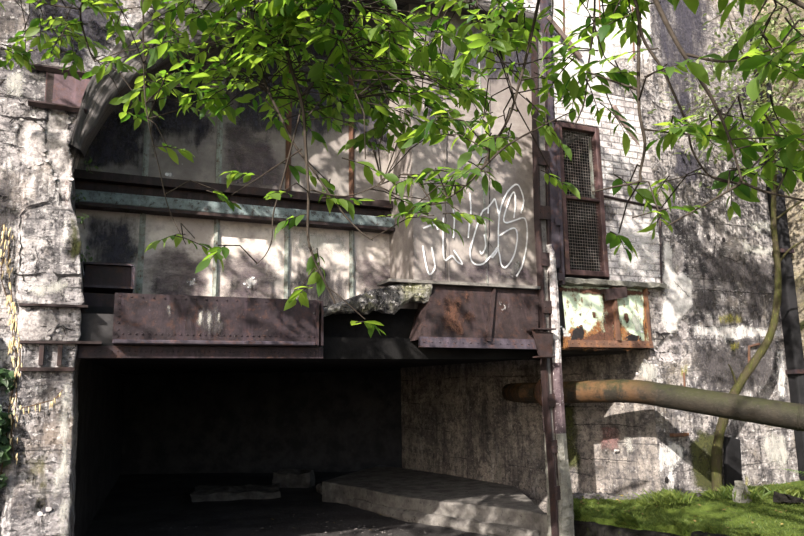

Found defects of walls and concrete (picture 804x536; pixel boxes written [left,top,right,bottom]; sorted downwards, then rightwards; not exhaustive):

leakage [83,103,143,170]
leakage [226,124,280,187]
crack [13,201,82,282]
corrosion [559,286,630,351]
corrosion [624,290,650,349]
leakage [693,243,785,396]